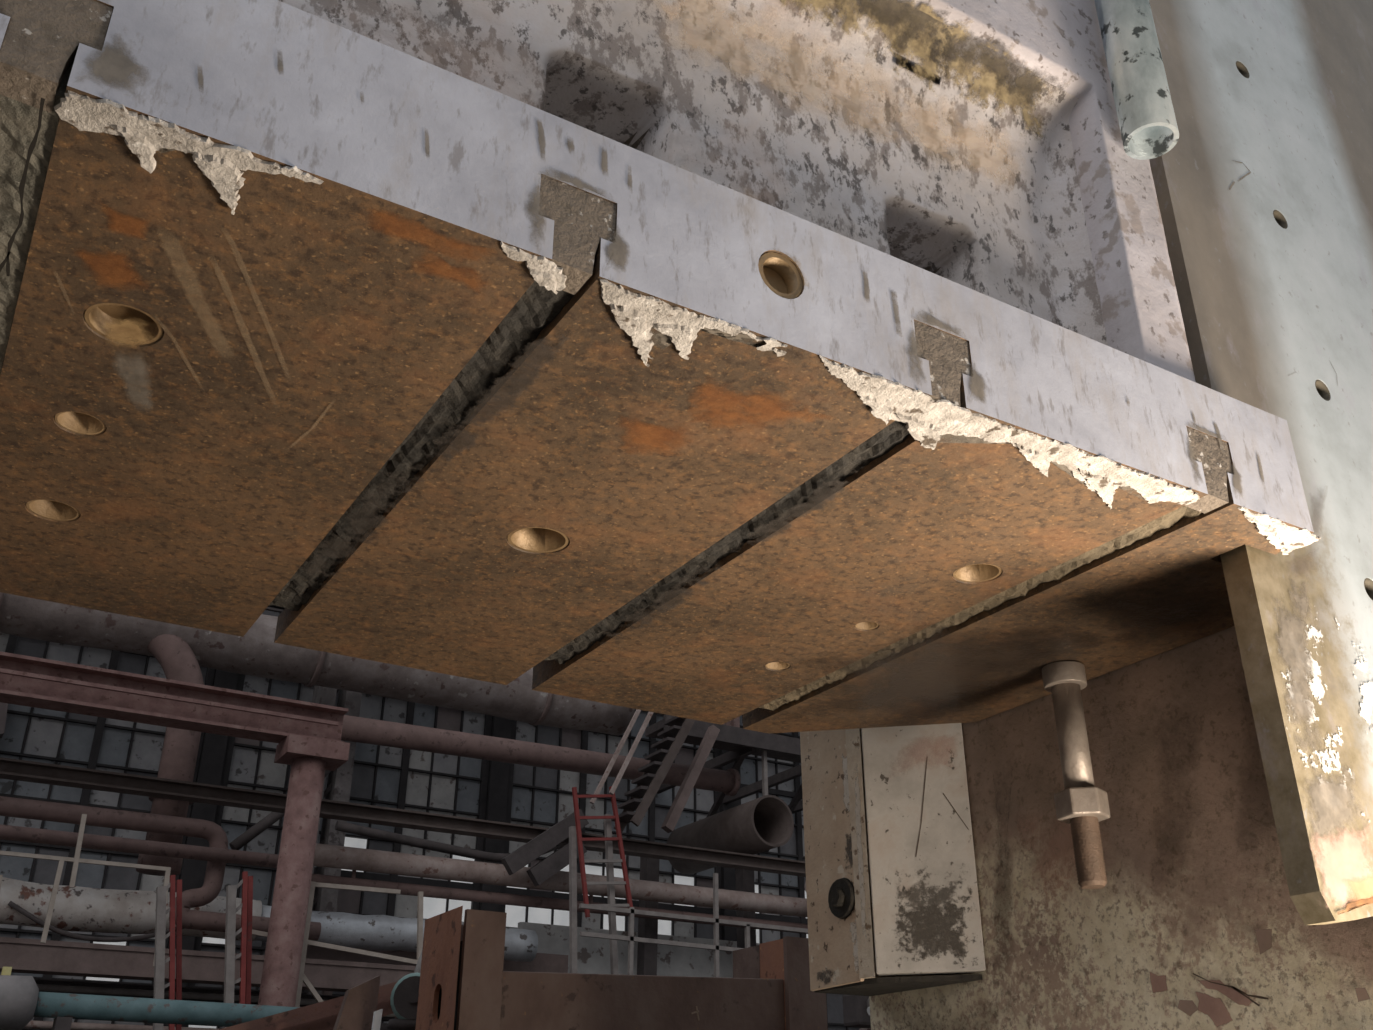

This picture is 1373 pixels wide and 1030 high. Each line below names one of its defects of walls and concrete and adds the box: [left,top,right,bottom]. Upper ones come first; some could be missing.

crack [0,98,45,276]
peeling [600,279,788,367]
peeling [819,355,1200,509]
peeling [1238,507,1321,555]
peeling [1150,972,1167,993]
peeling [1178,980,1252,1027]